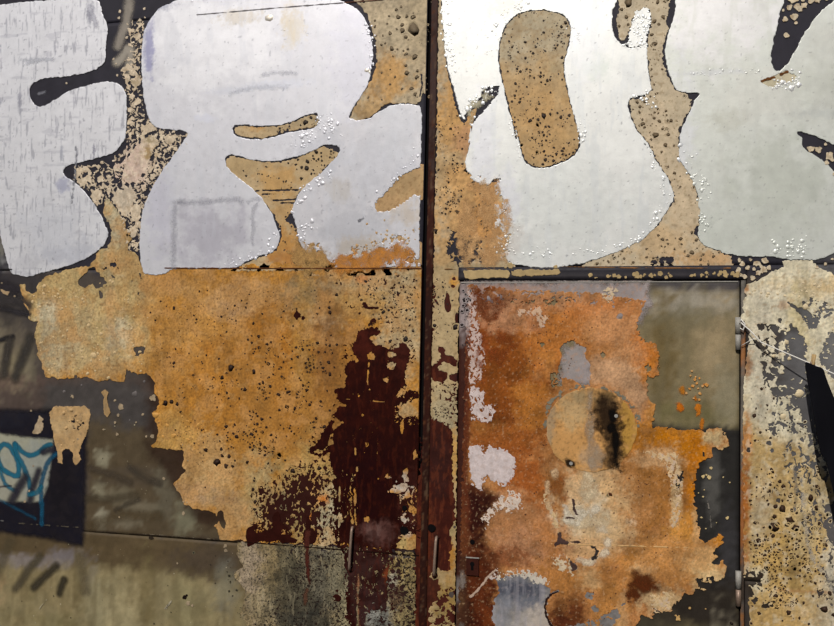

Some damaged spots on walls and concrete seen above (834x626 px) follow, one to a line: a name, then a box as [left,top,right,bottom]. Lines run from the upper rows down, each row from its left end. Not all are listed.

peeling [1,0,427,626]
corrosion [276,530,348,626]
corrosion [432,278,729,626]
peeling [426,0,834,626]